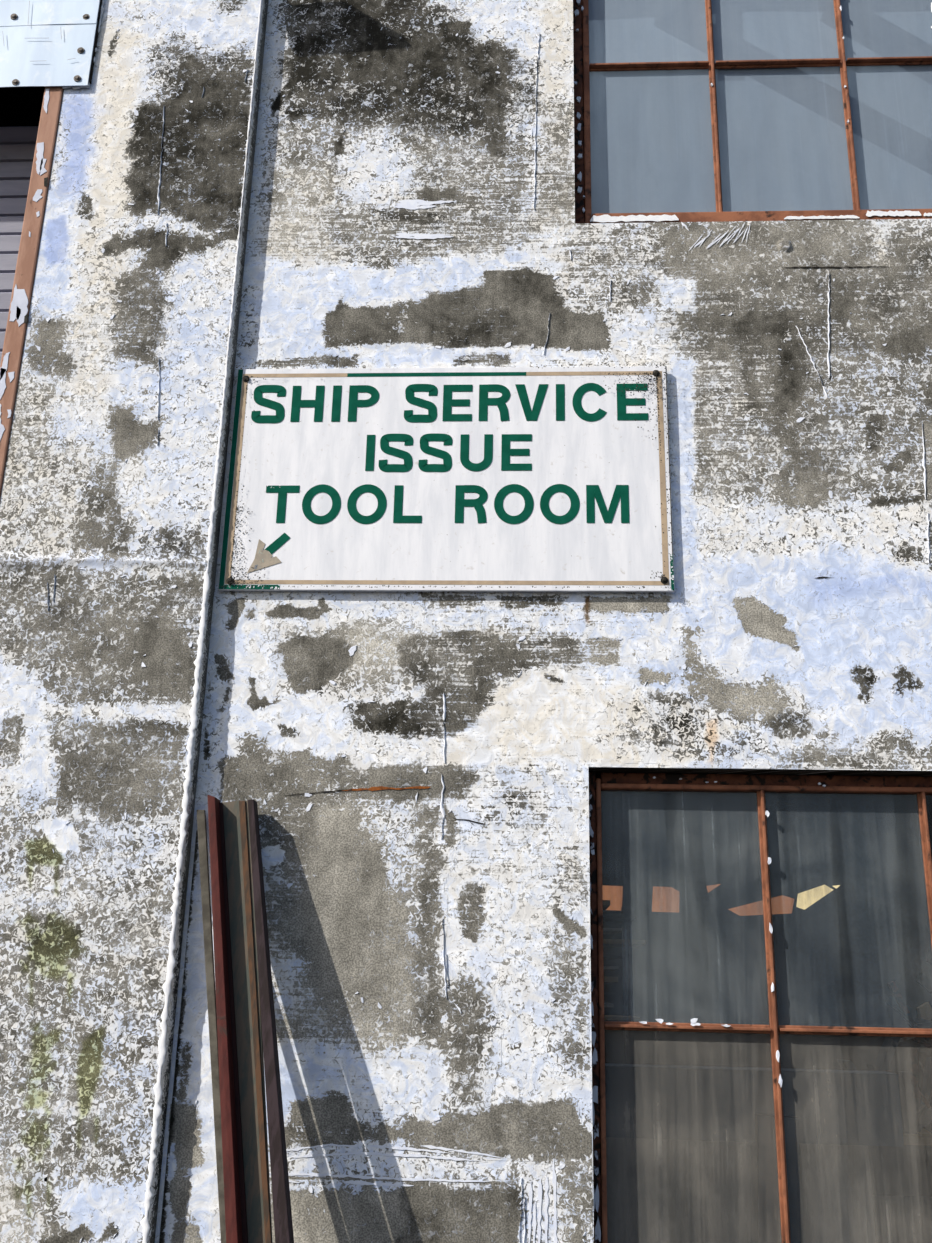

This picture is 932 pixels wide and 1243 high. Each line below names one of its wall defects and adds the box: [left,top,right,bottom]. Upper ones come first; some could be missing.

peeling [204,0,257,18]
peeling [268,0,551,164]
peeling [0,24,257,440]
peeling [359,185,458,231]
leakage [693,222,750,249]
peeling [253,265,665,369]
peeling [677,302,844,516]
peeling [0,398,932,1243]
leakage [24,856,62,899]
leakage [72,1113,103,1153]
leakage [286,1144,503,1161]
leakage [523,1158,558,1243]